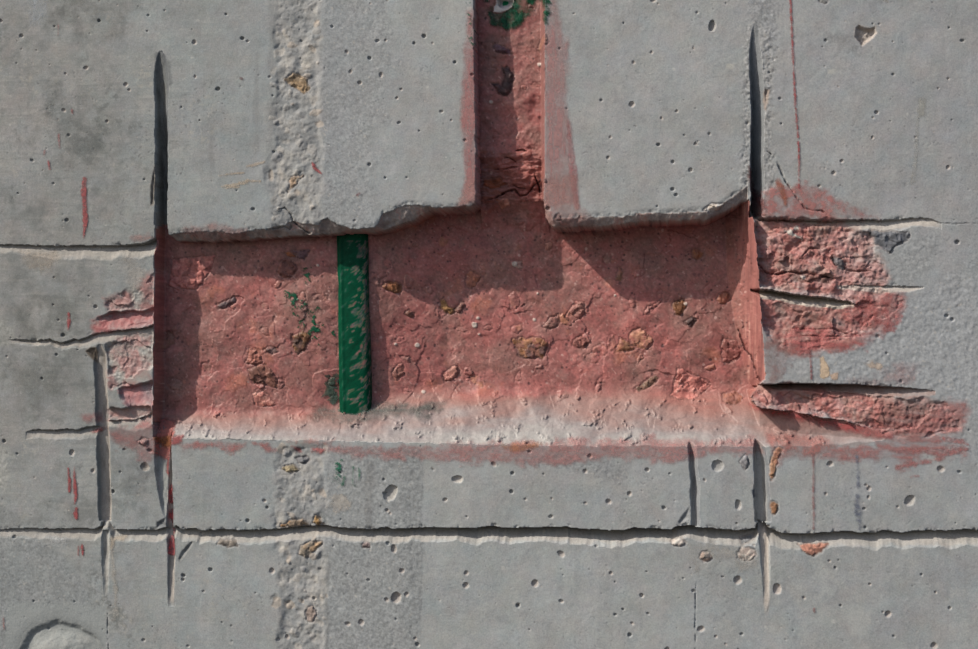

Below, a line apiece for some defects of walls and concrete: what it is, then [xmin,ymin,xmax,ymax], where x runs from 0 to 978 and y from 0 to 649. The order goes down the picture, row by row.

flaking render [492,67,515,97]
spalling [169,0,481,278]
spalling [150,165,163,207]
spalling [544,183,748,233]
crack [758,246,882,280]
spalling [755,216,911,358]
spalling [86,271,175,421]
flaking render [291,331,311,356]
flaking render [512,302,586,359]
crack [791,326,862,339]
flaking render [246,347,279,407]
spalling [723,390,971,440]